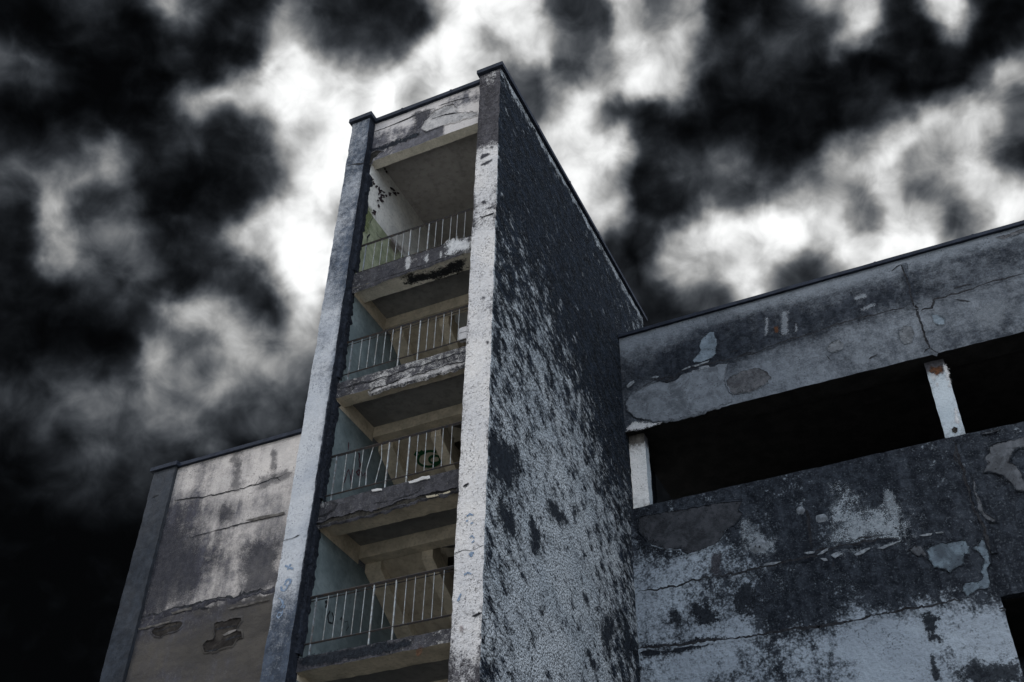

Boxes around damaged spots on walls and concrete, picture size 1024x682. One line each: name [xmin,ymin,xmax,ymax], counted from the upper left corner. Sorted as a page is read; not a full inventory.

crack [631,263,1024,395]
spalling [368,360,465,396]
spalling [624,331,773,423]
crack [152,472,290,500]
leakage [485,422,542,560]
leakage [544,491,570,527]
leakage [145,522,199,612]
leakage [241,539,280,592]
spalling [295,475,469,657]
crack [638,535,899,596]
peeling [805,531,992,598]
crack [638,598,961,654]